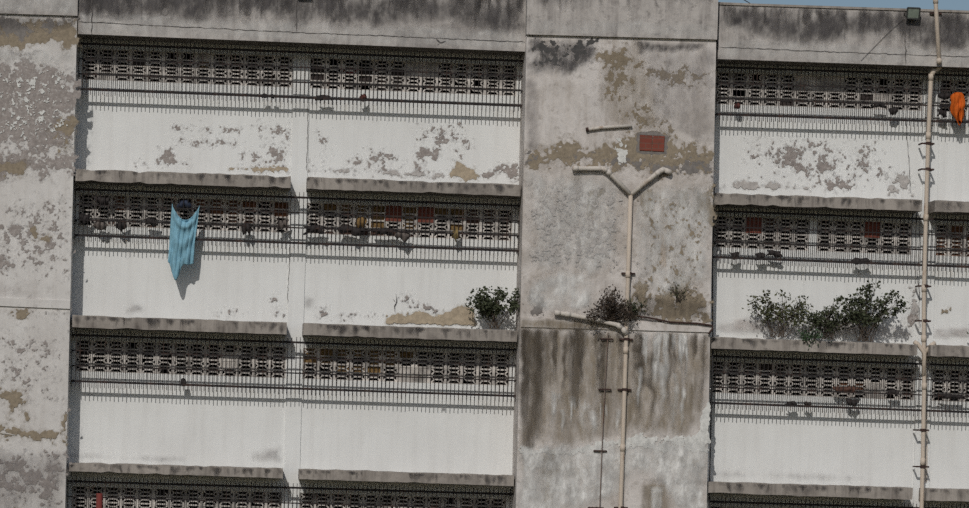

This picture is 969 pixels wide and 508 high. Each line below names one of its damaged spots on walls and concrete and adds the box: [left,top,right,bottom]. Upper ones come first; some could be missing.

damp [60,0,438,25]
damp [450,0,521,30]
damp [726,7,969,47]
peeling [0,16,81,181]
peeling [156,125,289,173]
spalling [325,47,718,326]
peeling [733,138,914,196]
peeling [0,201,76,276]
damp [529,182,608,308]
damp [646,191,722,291]
peeling [0,337,72,508]
damp [520,321,716,508]